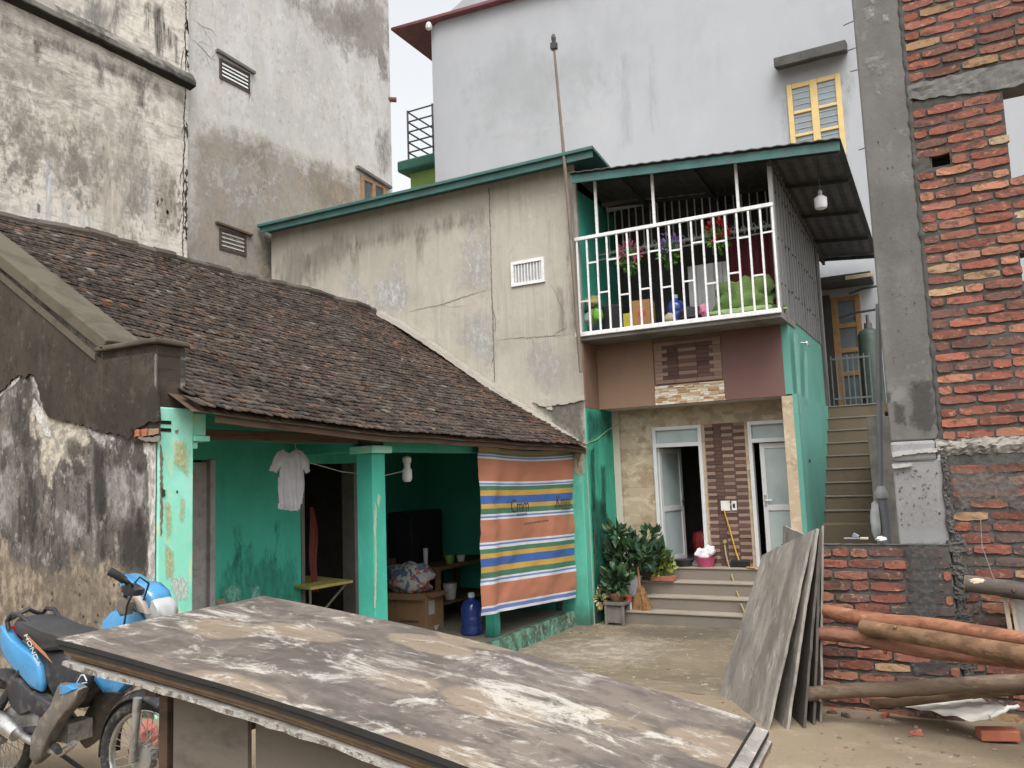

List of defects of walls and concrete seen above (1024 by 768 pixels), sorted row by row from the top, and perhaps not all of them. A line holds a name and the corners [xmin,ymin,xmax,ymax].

water stain [148,8,177,54]
crack [179,1,216,256]
water stain [188,130,380,279]
crack [406,188,572,382]
peeling [0,470,14,524]
peeling [2,431,13,448]
water stain [32,379,51,437]
flaking render [30,407,90,488]
peeling [63,511,81,541]
water stain [0,505,147,630]
water stain [67,429,115,529]
peeling [108,413,189,600]